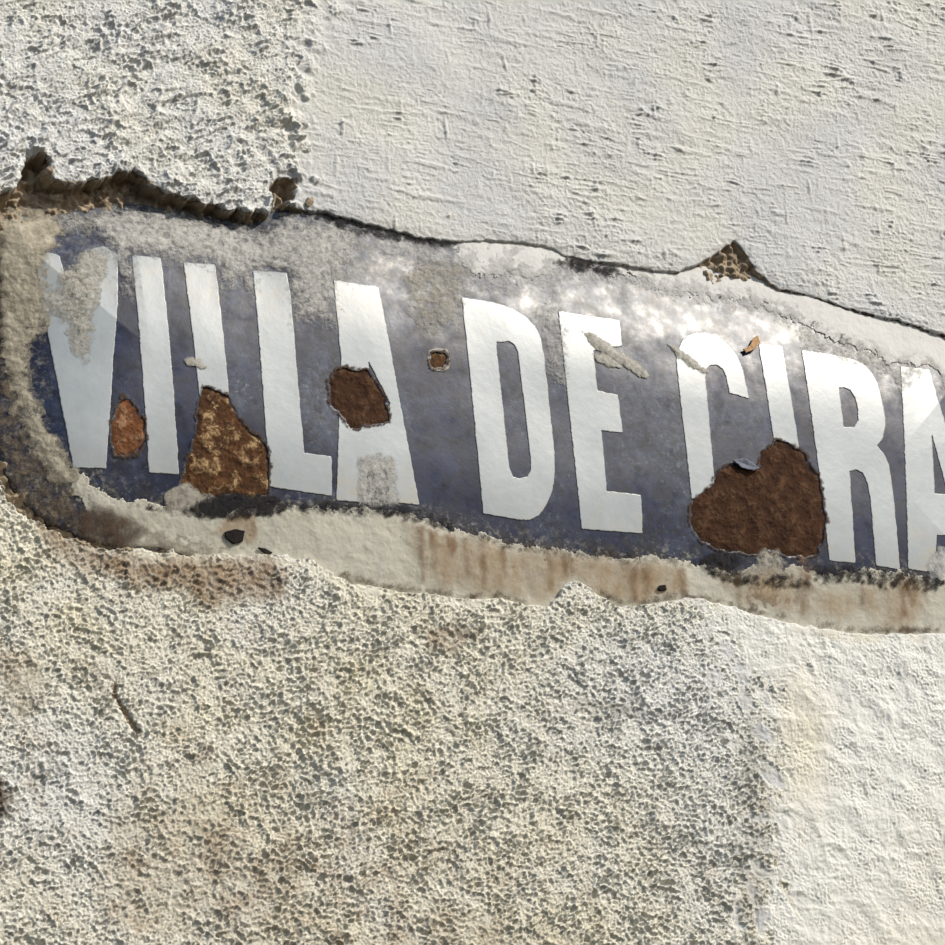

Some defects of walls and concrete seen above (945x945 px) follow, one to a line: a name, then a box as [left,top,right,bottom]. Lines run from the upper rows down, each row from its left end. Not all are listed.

flaking render [0,150,262,227]
flaking render [269,177,298,209]
flaking render [671,243,779,291]
peeling [582,331,649,378]
peeling [668,343,709,374]
peeling [743,335,760,353]
peeling [733,458,759,471]
flaking render [0,461,133,551]